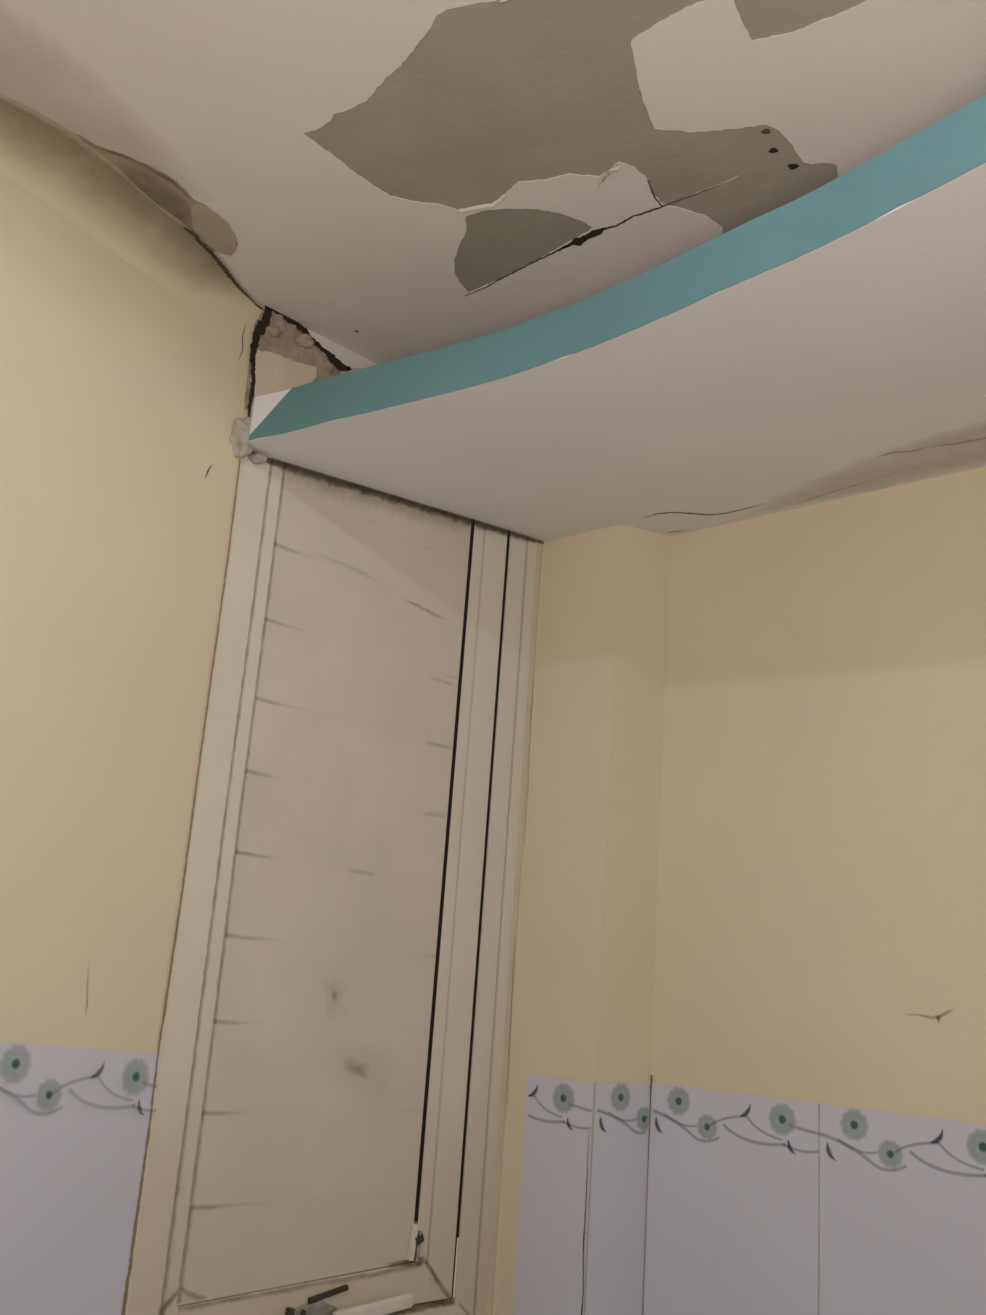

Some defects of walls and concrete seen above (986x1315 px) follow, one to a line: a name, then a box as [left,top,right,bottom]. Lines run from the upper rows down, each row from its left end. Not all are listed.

peeling [734,0,866,40]
peeling [304,0,838,292]
crack [184,227,264,359]
crack [465,180,716,296]
crack [645,503,766,518]